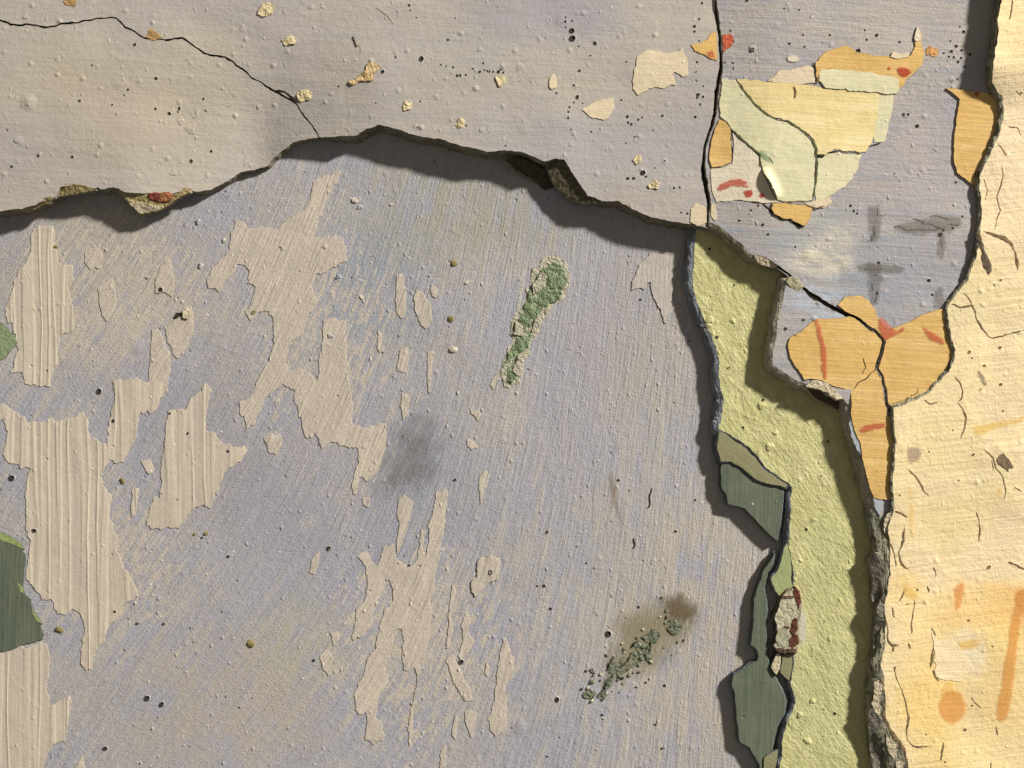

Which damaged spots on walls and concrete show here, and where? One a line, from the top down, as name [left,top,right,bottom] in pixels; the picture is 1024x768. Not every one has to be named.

peeling [0,225,116,387]
crack [0,17,317,132]
peeling [207,171,386,508]
peeling [0,0,720,231]
crack [702,9,881,229]
peeling [683,0,1024,768]
crack [802,287,967,437]
crack [952,294,1024,339]
crack [976,126,1021,275]
peeling [0,306,248,768]
peeling [320,489,448,747]
crack [880,511,944,768]